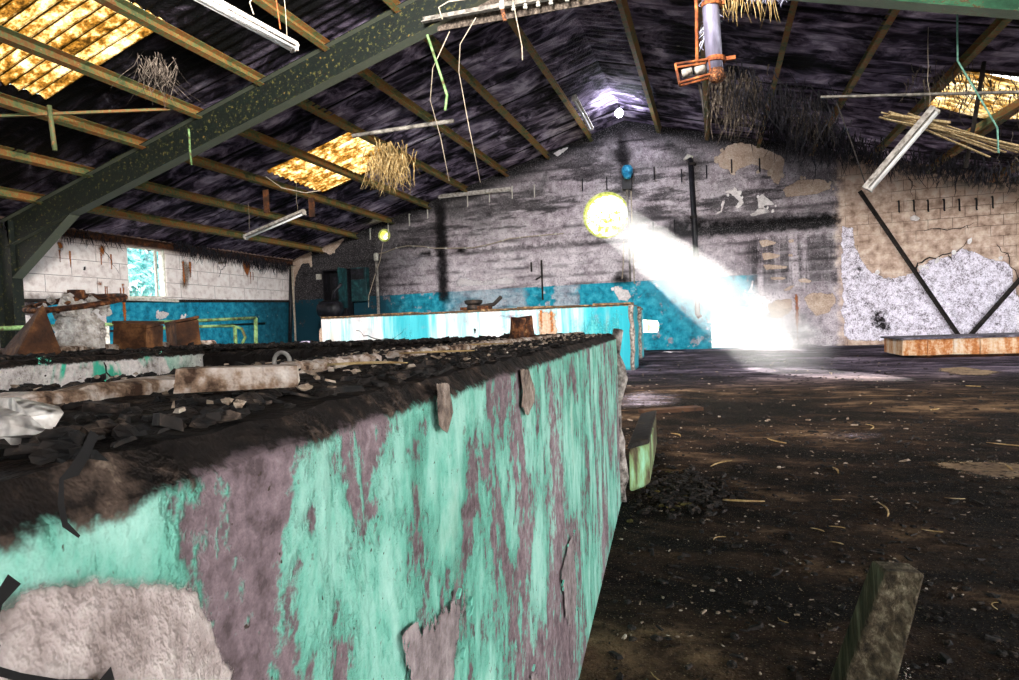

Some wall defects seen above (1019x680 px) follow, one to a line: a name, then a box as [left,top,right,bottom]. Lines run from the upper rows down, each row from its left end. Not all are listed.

peeling [714,142,834,197]
spalling [716,187,744,214]
spalling [750,194,777,216]
peeling [759,239,836,318]
spalling [0,397,64,445]
spalling [437,383,453,433]
spalling [520,369,535,415]
peeling [402,588,474,680]